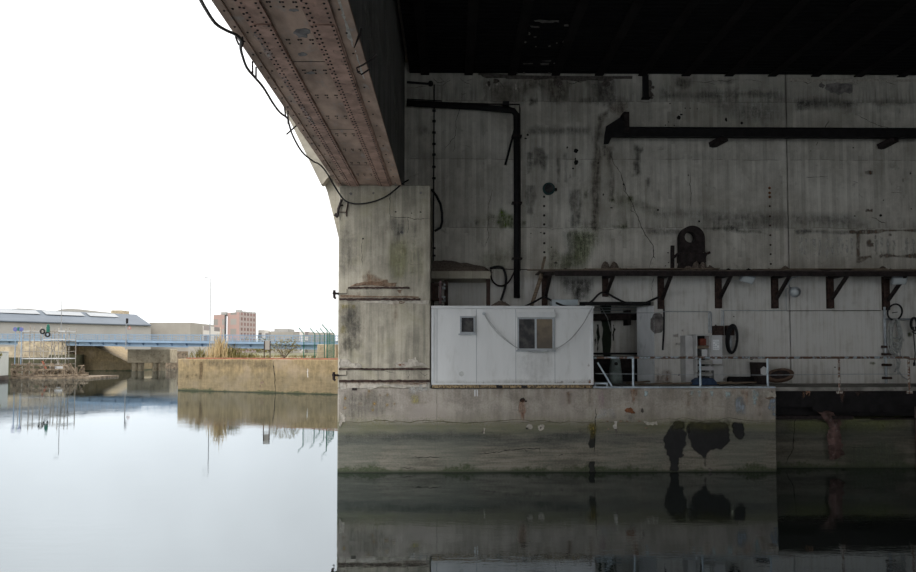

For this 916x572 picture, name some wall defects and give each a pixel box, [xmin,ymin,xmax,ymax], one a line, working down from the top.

water stain [663,421,744,471]